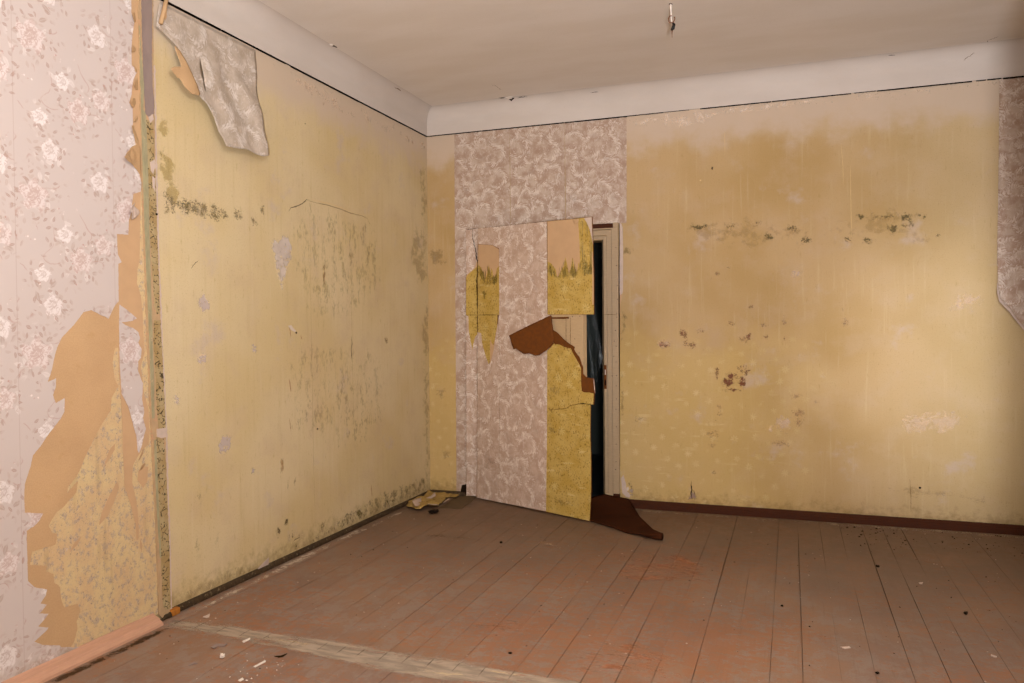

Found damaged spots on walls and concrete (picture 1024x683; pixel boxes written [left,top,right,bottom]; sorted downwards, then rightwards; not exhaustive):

leakage [163,192,264,224]
peeling [30,211,167,648]